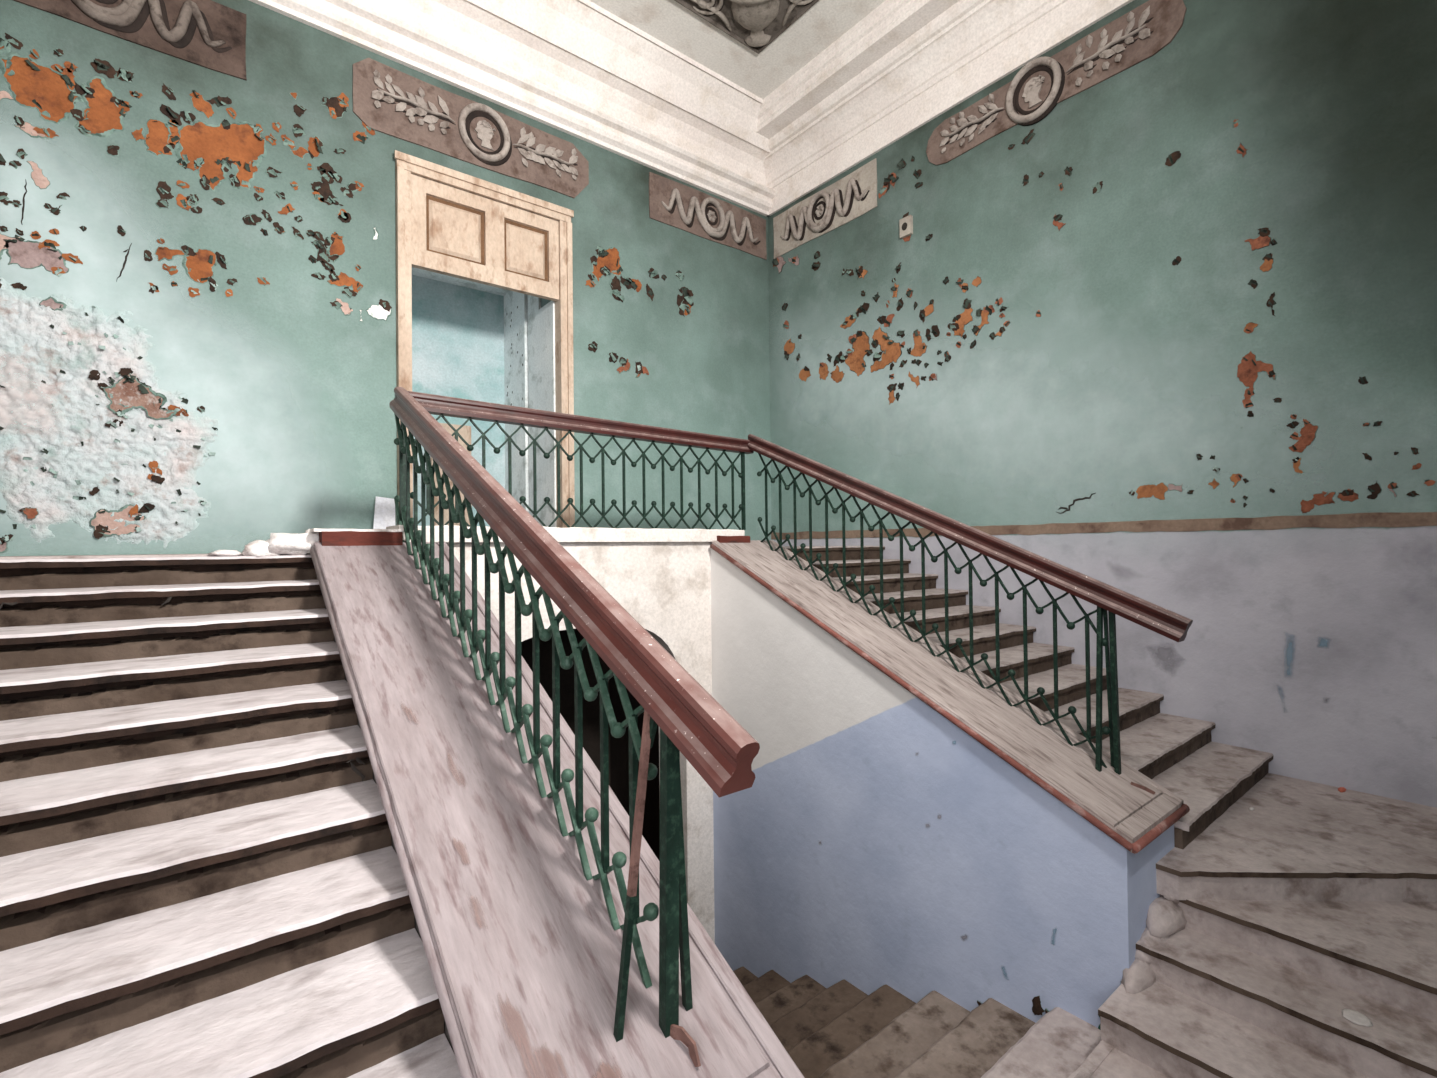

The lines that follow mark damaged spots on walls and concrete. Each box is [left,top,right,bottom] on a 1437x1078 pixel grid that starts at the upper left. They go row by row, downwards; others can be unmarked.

peeling [0,33,392,322]
peeling [586,246,694,317]
peeling [1243,227,1277,334]
flaking render [88,368,205,429]
peeling [588,341,649,378]
peeling [782,263,1011,405]
peeling [1237,351,1277,417]
peeling [1273,398,1319,473]
flaking render [89,486,155,539]
flaking render [147,461,165,485]
peeling [1129,454,1249,508]
peeling [1300,447,1436,513]